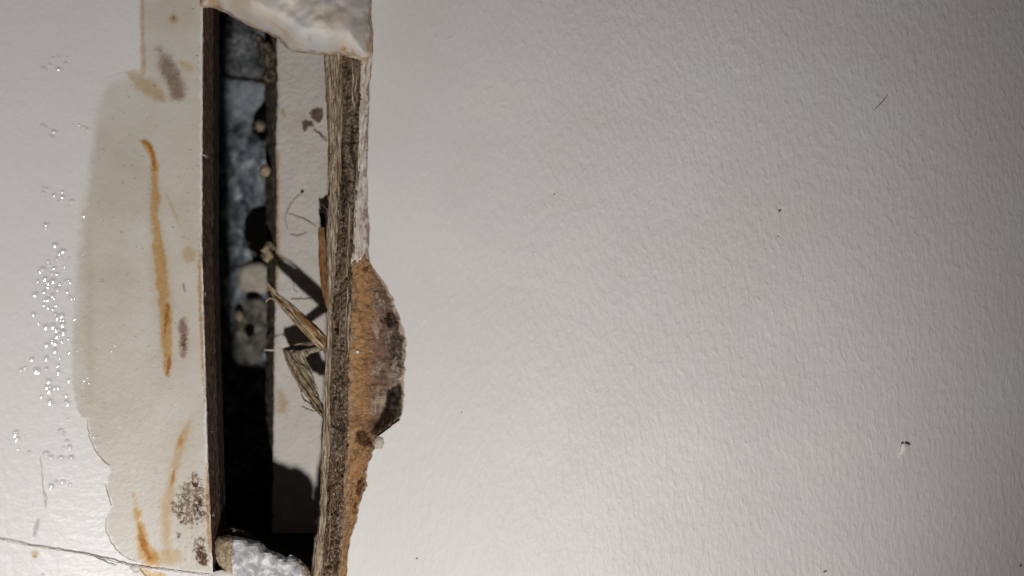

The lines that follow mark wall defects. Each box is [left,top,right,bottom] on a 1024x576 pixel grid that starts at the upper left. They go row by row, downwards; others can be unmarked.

crack [0,538,212,576]
peeling [69,0,235,576]
spalling [264,33,278,533]
spalling [302,46,373,576]